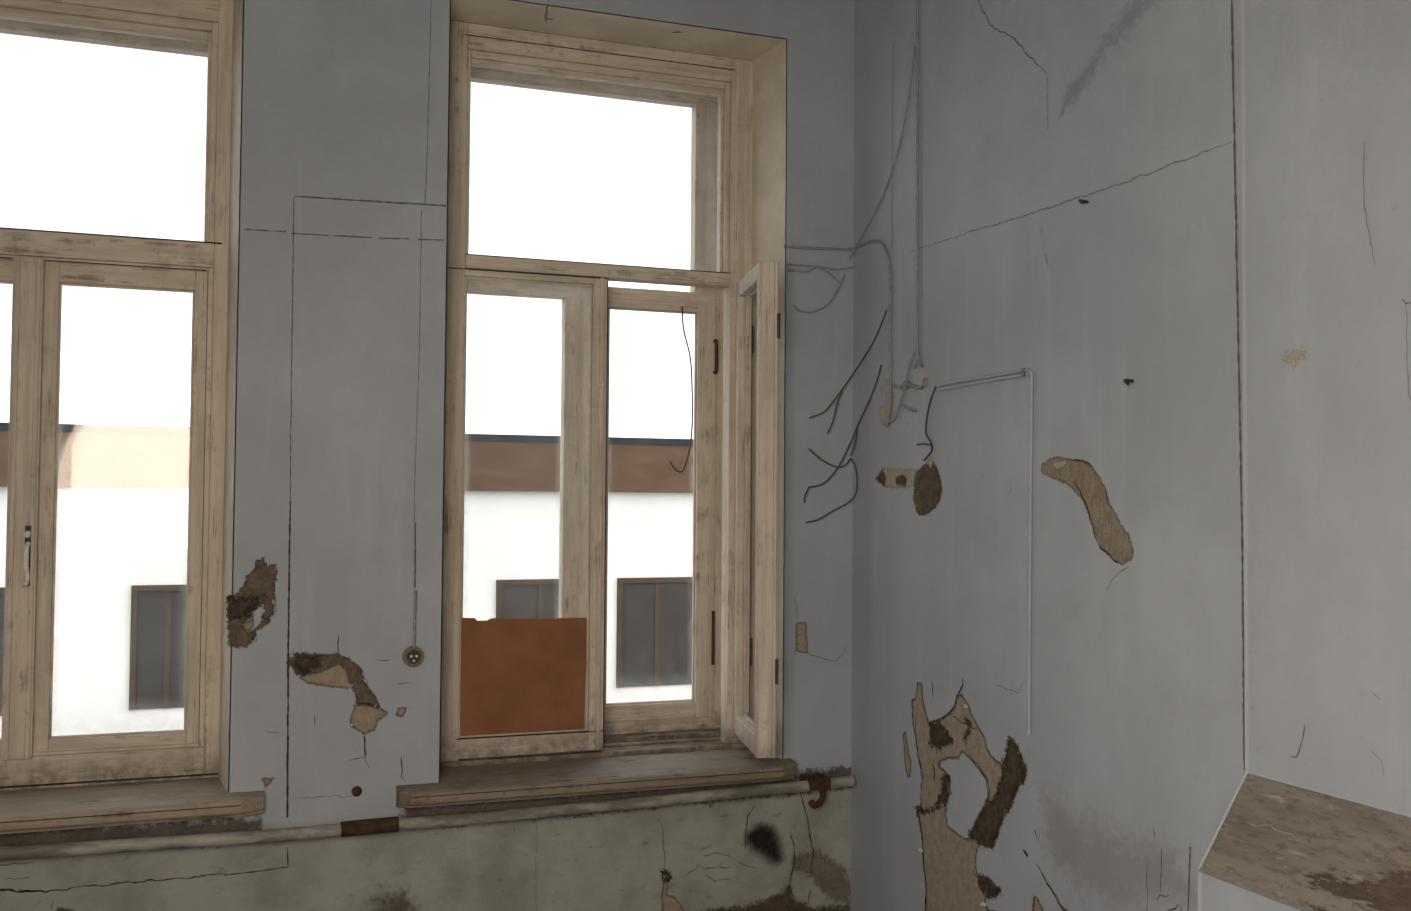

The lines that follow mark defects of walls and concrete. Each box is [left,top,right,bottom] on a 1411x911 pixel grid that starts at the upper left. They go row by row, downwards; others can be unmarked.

crack [1363,141,1375,266]
crack [1402,299,1411,400]
spalling [875,459,942,516]
spalling [1041,456,1134,565]
spalling [224,557,278,648]
spalling [286,635,407,759]
peeling [902,678,1027,911]
spalling [1023,829,1068,911]